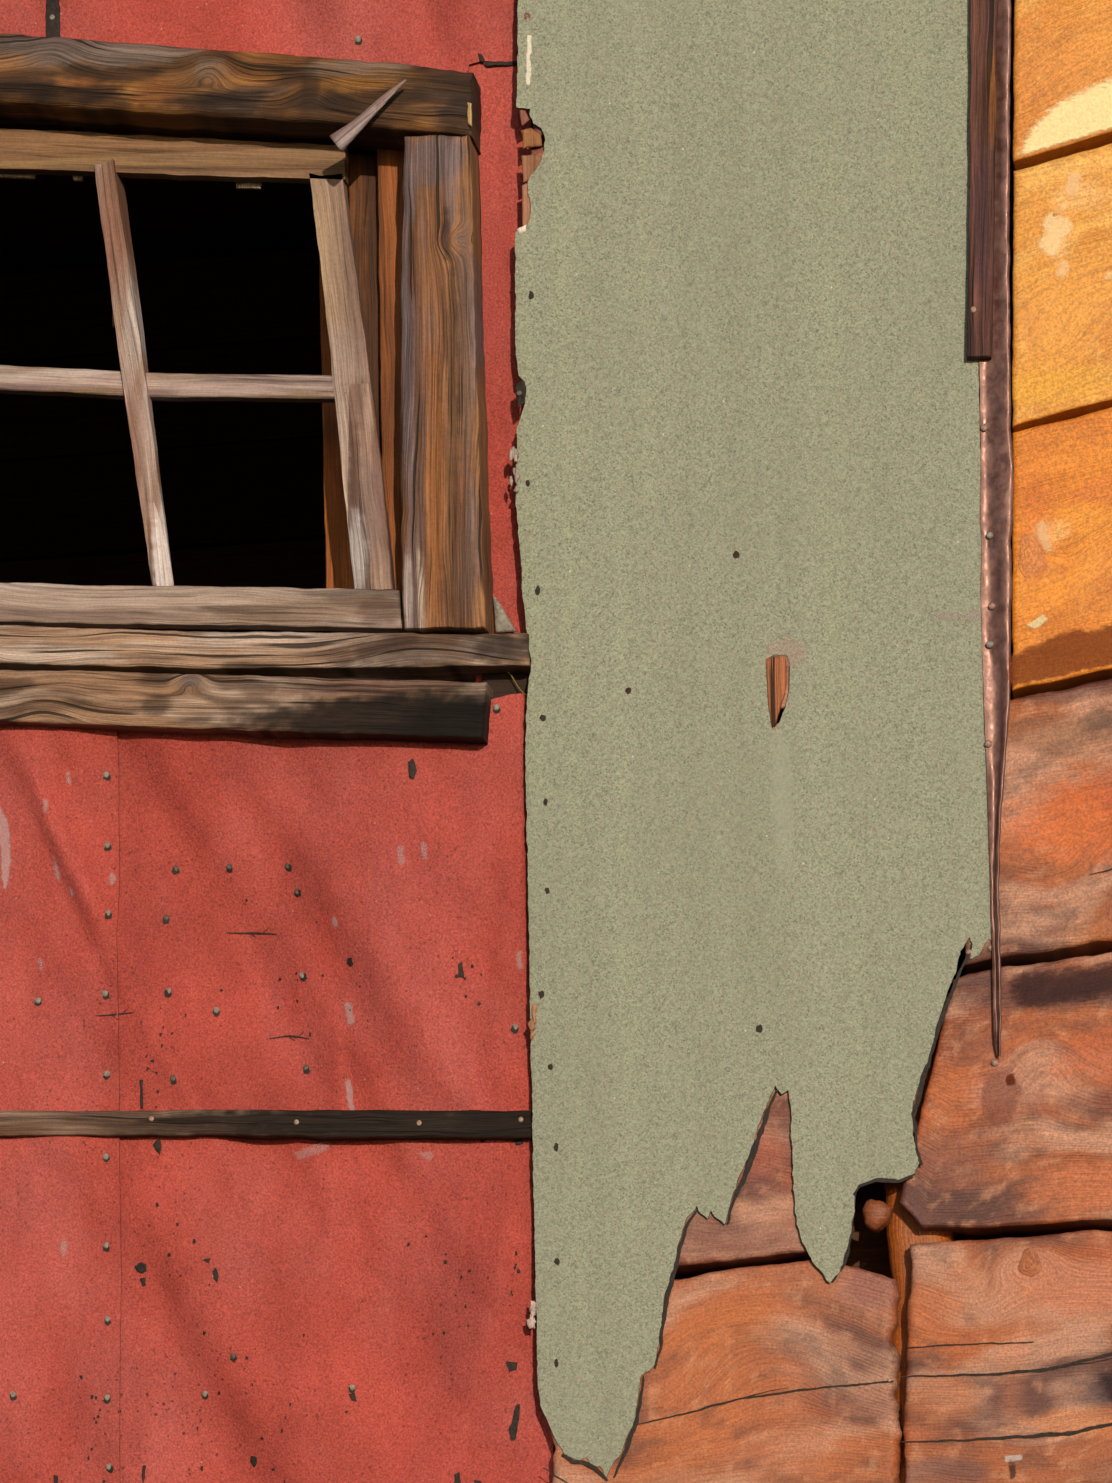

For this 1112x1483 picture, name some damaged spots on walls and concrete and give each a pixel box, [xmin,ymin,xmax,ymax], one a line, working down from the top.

peeling [519,109,542,149]
peeling [516,183,531,234]